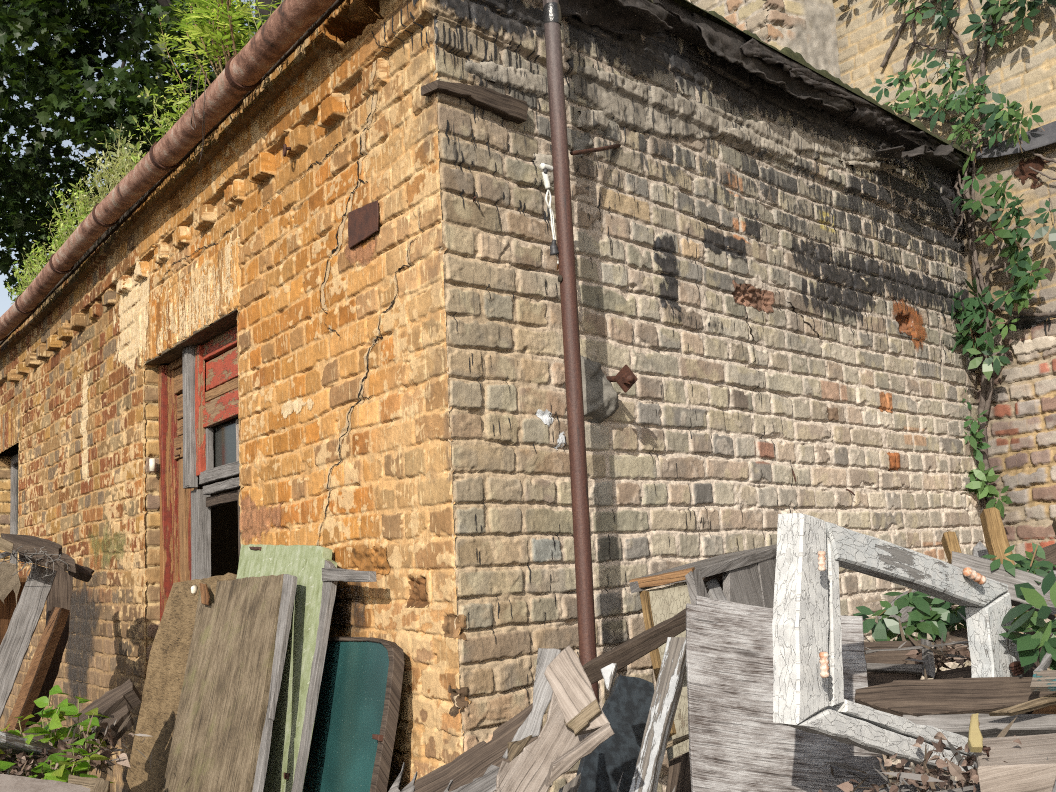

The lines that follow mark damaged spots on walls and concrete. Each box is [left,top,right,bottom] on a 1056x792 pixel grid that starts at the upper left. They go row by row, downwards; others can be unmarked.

damp [564,34,602,114]
rust [345,237,377,265]
damp [803,153,953,371]
rust [893,301,927,349]
crack [316,207,423,546]